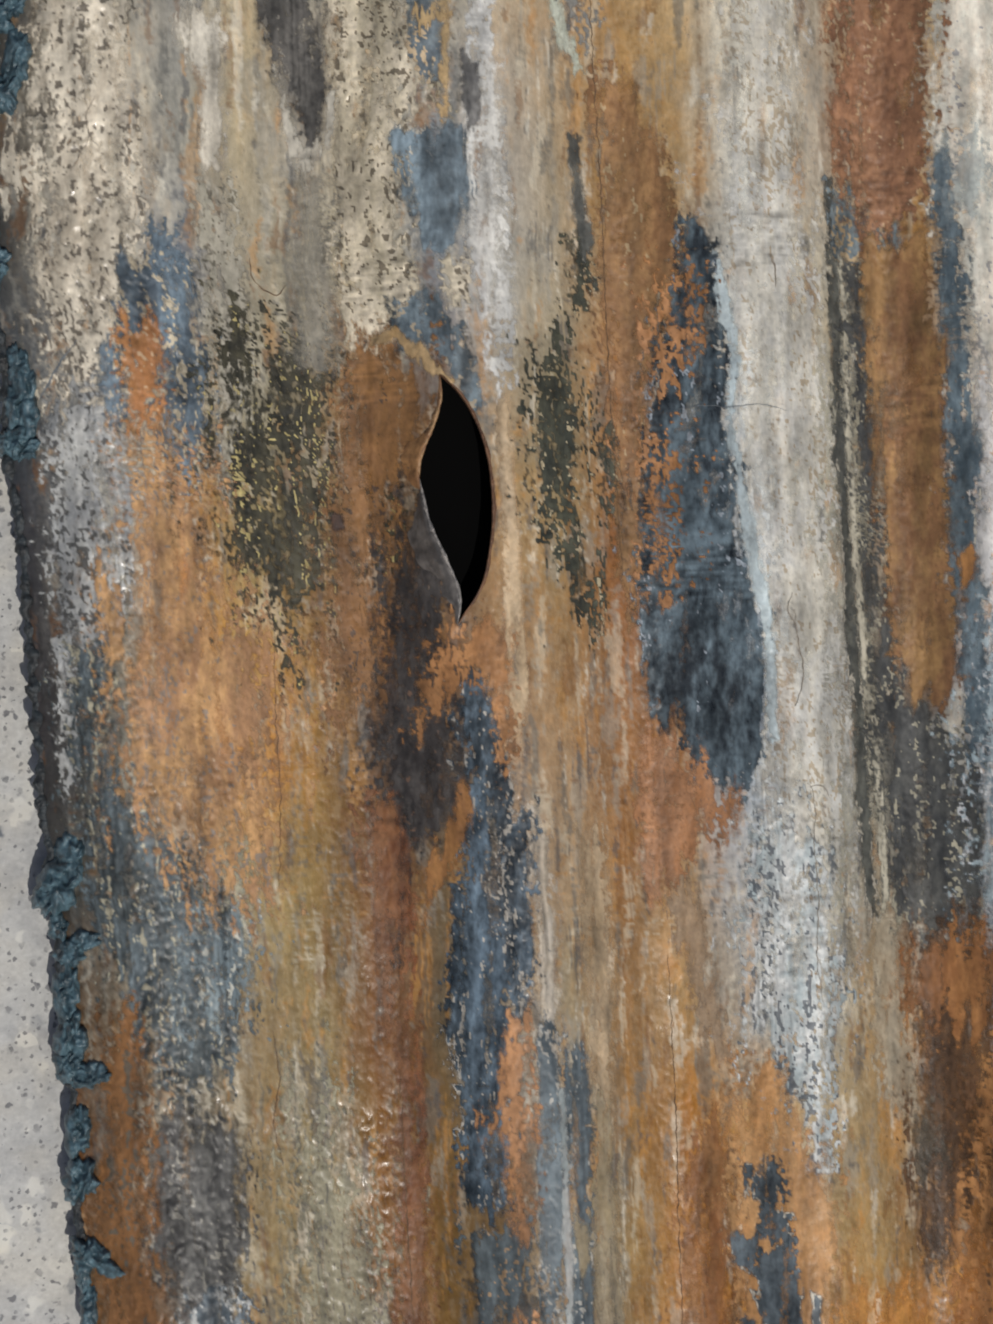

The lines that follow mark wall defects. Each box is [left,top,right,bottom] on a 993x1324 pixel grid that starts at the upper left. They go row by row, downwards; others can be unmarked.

rust [80,305,455,947]
rust [577,59,721,634]
rust [630,722,742,908]
rust [822,0,976,718]
rust [83,991,169,1324]
rust [667,901,993,1324]